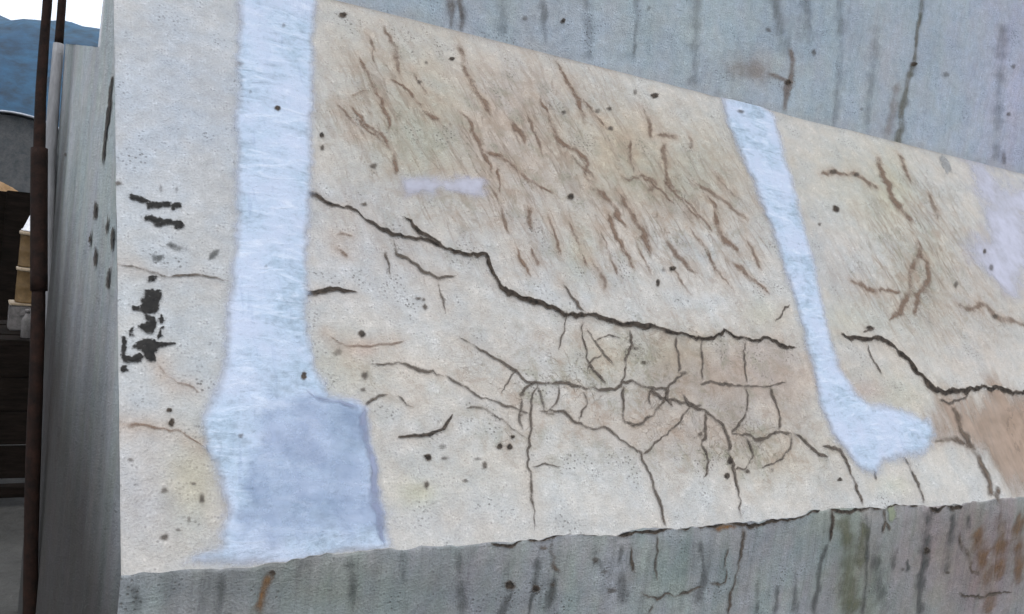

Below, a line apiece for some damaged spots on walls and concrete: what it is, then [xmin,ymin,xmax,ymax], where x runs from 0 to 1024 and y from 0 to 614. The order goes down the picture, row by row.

peeling [120,305,176,372]
crack [307,29,963,614]
crack [822,155,1024,500]